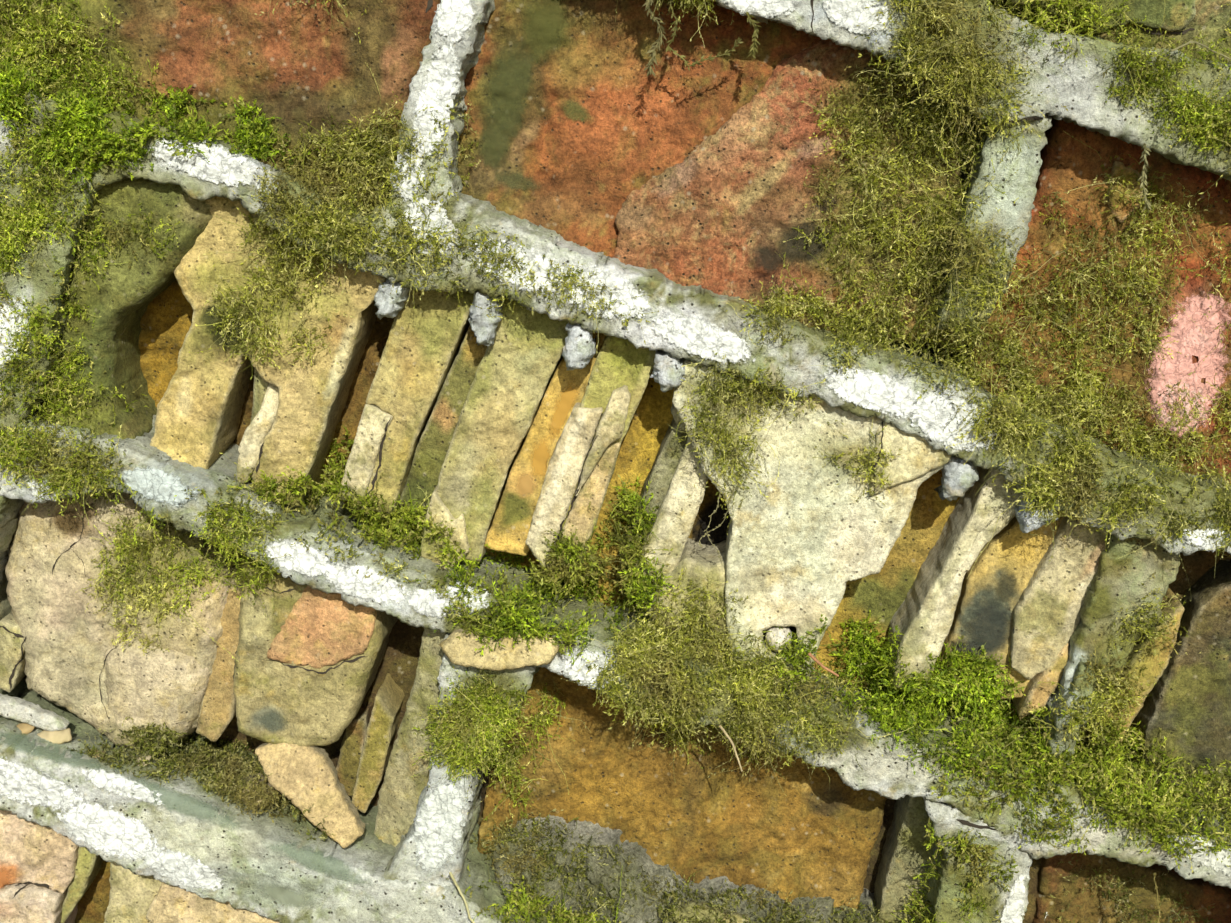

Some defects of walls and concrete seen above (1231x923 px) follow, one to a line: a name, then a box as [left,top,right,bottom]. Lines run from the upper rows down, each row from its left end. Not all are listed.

crack [52,514,86,577]